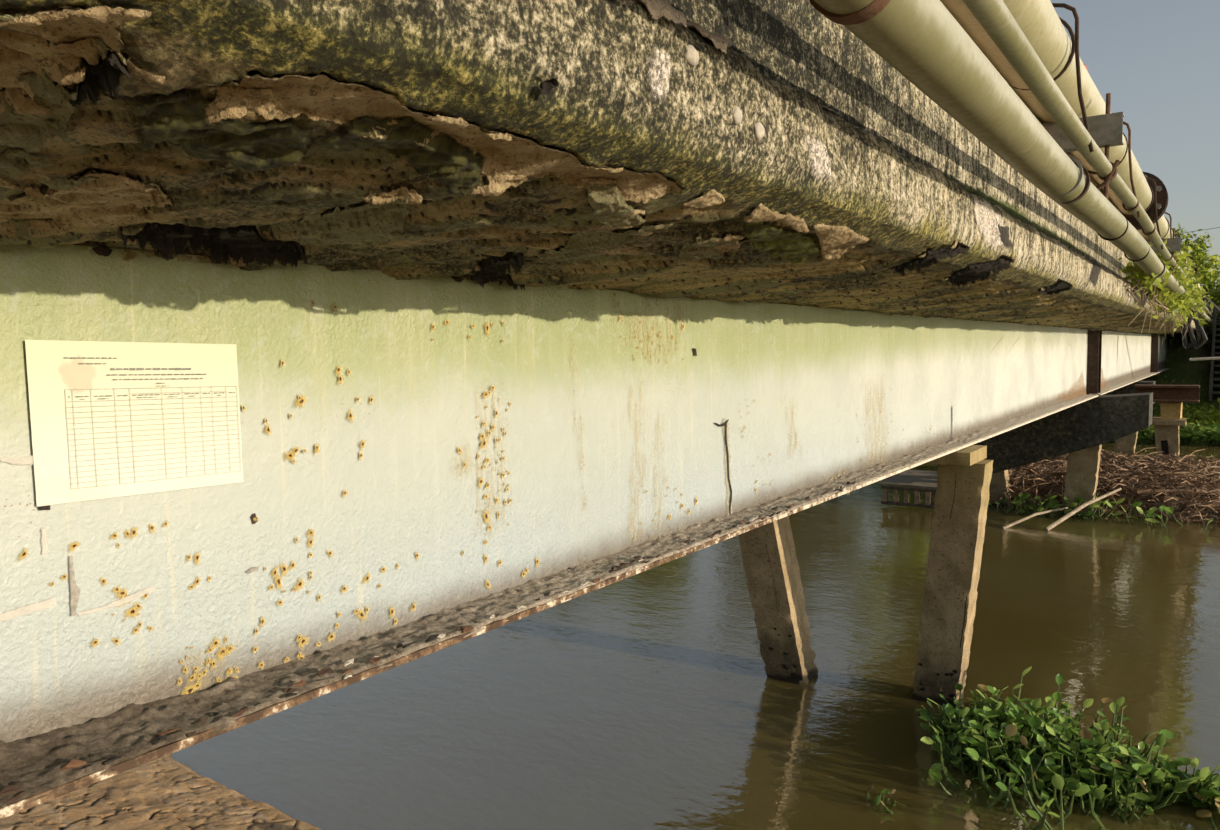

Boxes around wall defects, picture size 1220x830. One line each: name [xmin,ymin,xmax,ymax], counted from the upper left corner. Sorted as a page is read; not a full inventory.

leakage [651,50,670,97]
spalling [0,4,435,267]
spalling [204,73,725,263]
leakage [807,140,831,179]
peeling [678,203,870,263]
leakage [974,200,1014,248]
spalling [893,240,1016,289]
leakage [1086,257,1101,286]
rust [457,385,512,566]
rust [517,382,856,610]
rust [264,529,333,606]
rust [101,578,153,634]